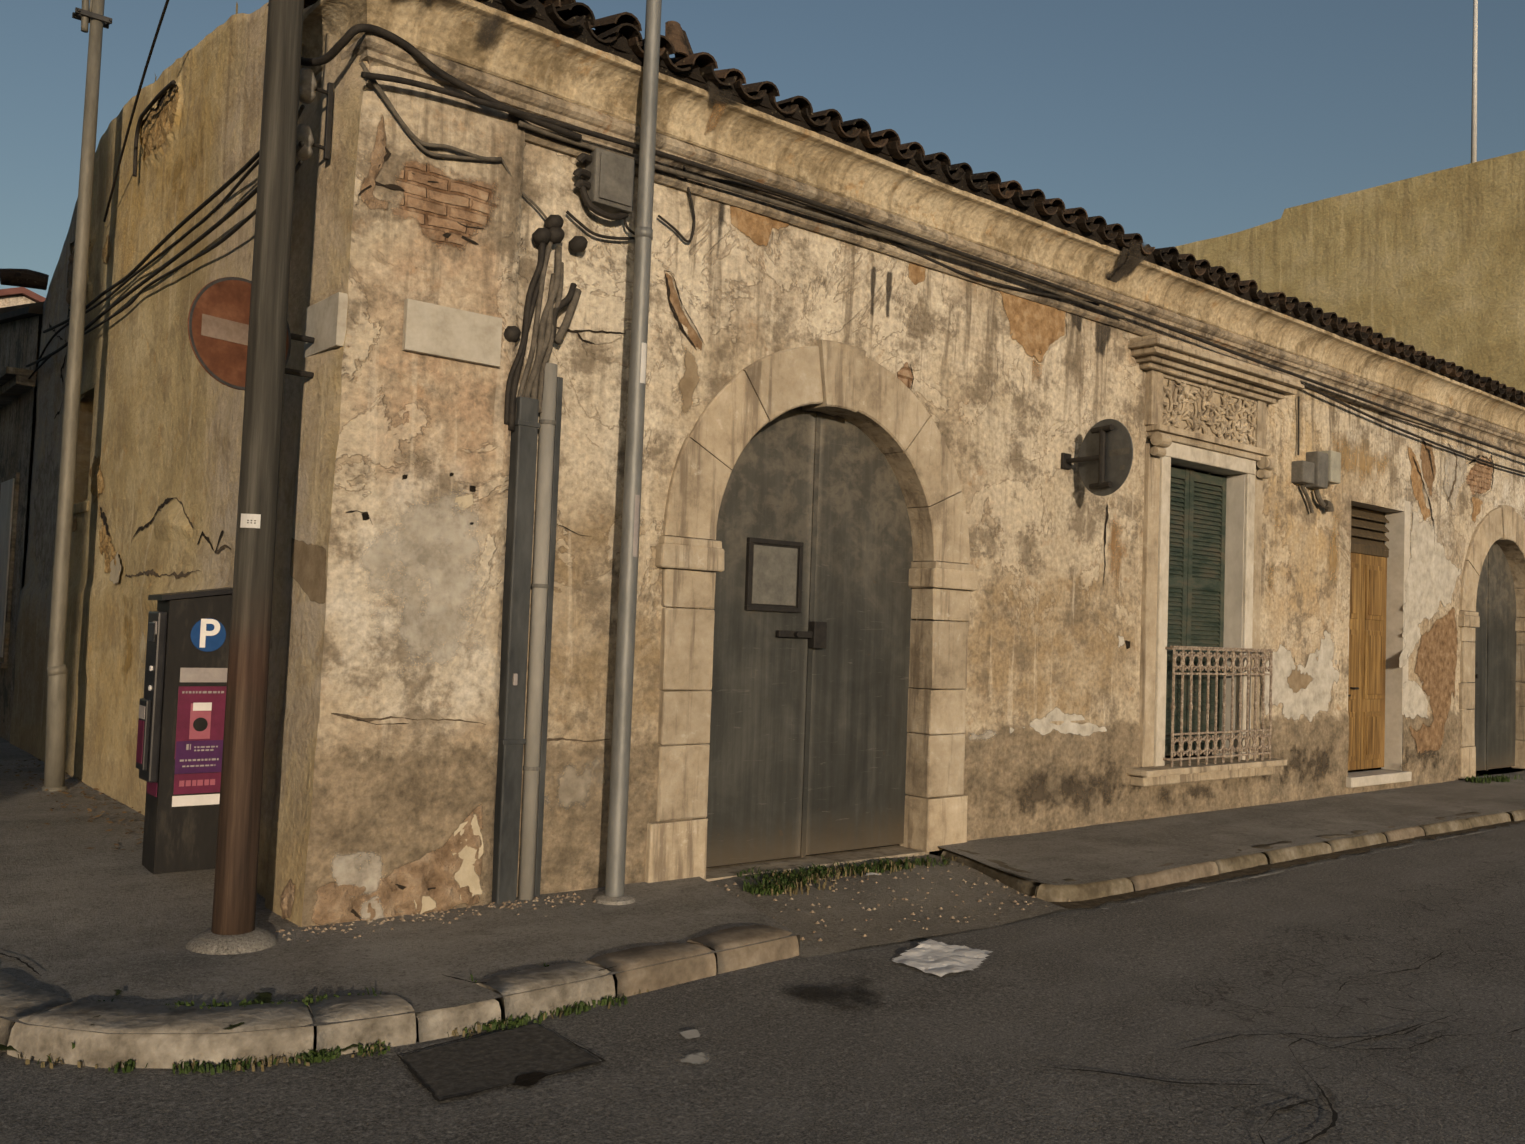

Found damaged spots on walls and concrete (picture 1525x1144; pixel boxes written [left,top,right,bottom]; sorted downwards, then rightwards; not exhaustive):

spalling [139,72,184,171]
spalling [66,225,111,318]
spalling [358,115,498,250]
flaking render [725,204,793,253]
flaking render [995,290,1069,375]
crack [125,497,231,579]
flaking render [1399,440,1495,754]
flaking render [1259,622,1340,725]
flaking render [969,707,1107,740]
spalling [312,805,484,925]
crack [1174,1005,1525,1051]
crack [1258,1099,1330,1144]